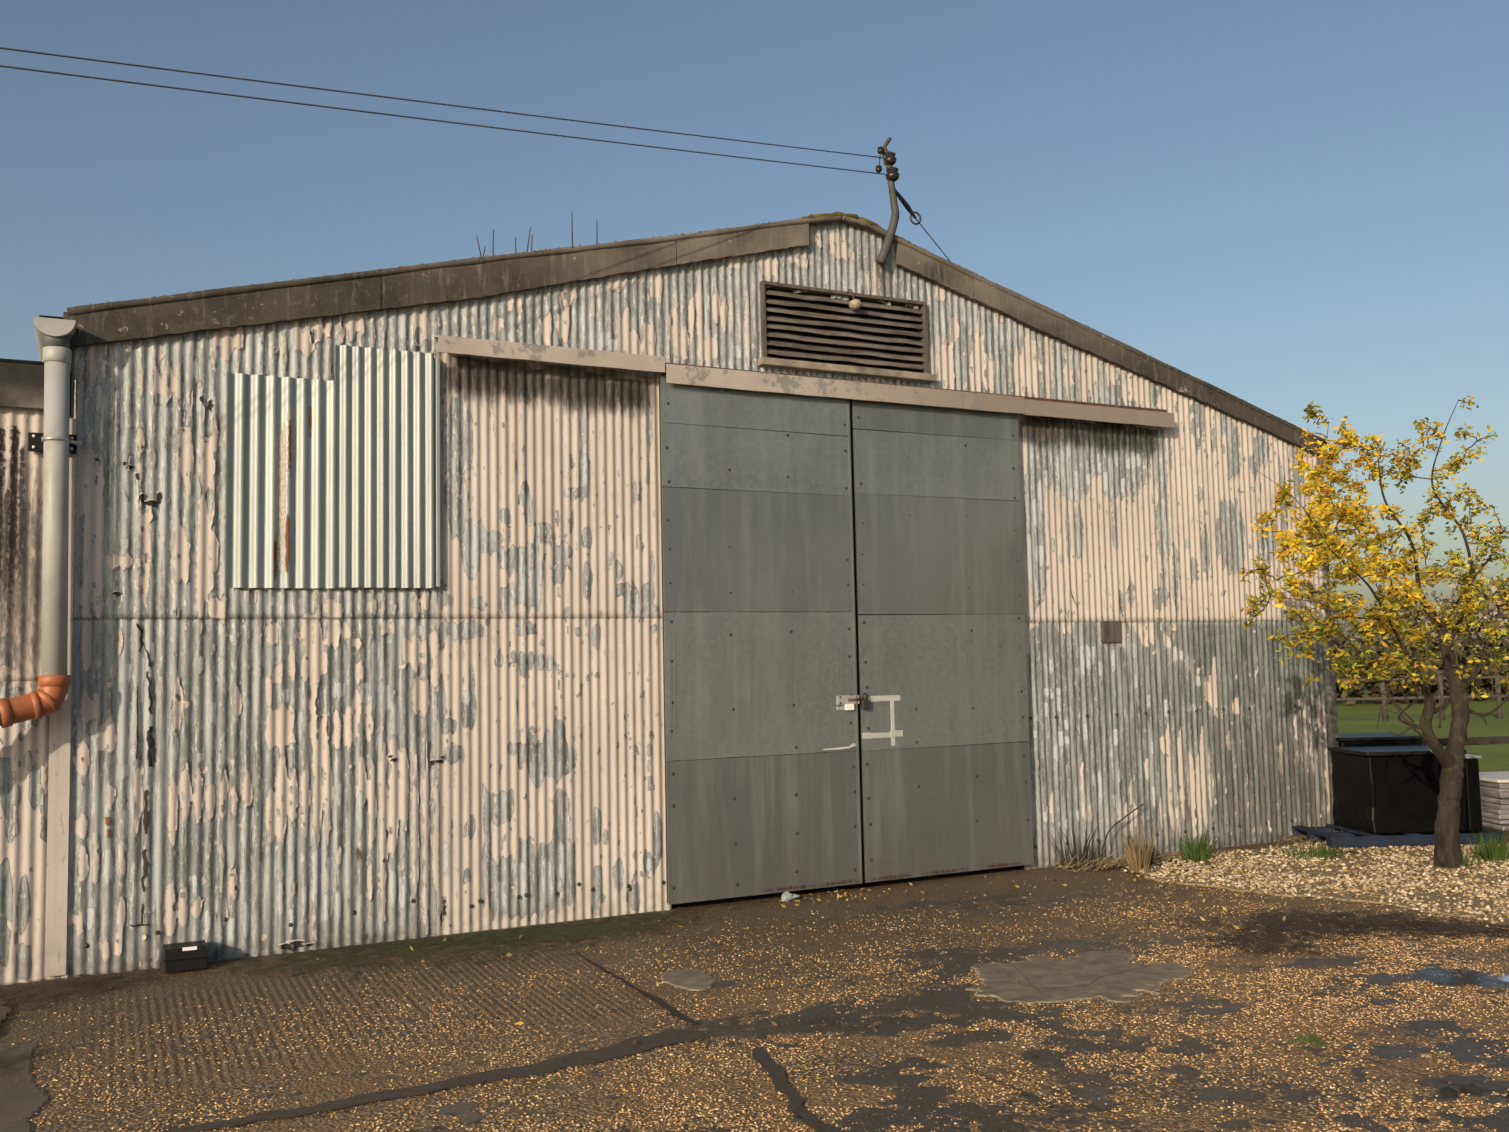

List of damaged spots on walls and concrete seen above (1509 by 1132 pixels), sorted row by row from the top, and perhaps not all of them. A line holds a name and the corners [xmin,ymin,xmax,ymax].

water stain [458,357,649,408]
water stain [0,425,25,616]
peeling [0,633,34,699]
water stain [126,642,155,726]
corrosion [274,516,290,578]
peeling [67,231,1332,971]
water stain [1021,415,1156,589]
peeling [0,719,49,980]